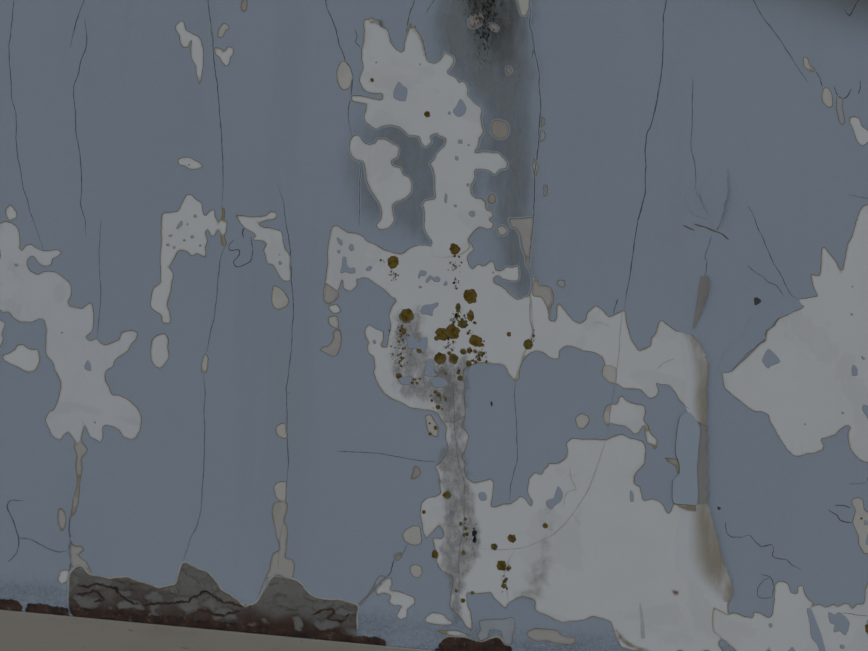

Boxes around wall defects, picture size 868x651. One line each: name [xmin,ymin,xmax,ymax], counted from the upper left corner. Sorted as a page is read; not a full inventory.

peeling [467,13,500,32]
peeling [0,193,417,636]
peeling [318,16,868,651]